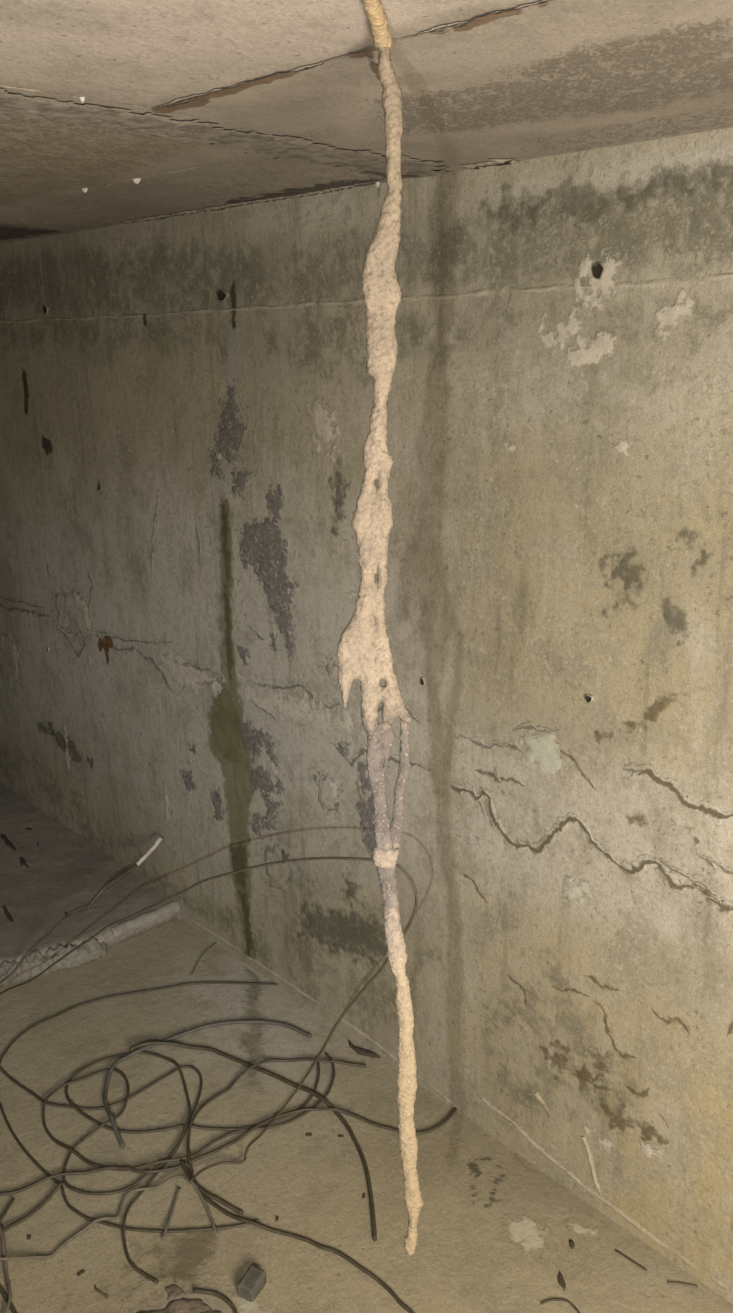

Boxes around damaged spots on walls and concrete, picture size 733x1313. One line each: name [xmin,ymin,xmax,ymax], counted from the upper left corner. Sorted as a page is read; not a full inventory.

corrosion [430,10,523,34]
corrosion [152,72,299,114]
corrosion [349,48,383,89]
peeling [537,306,616,367]
peeling [655,288,694,340]
peeling [209,378,252,501]
peeling [239,484,299,662]
corrosion [98,636,113,665]
damp [128,316,366,958]
crack [0,561,733,920]
peeling [338,741,376,863]
damp [298,879,387,964]